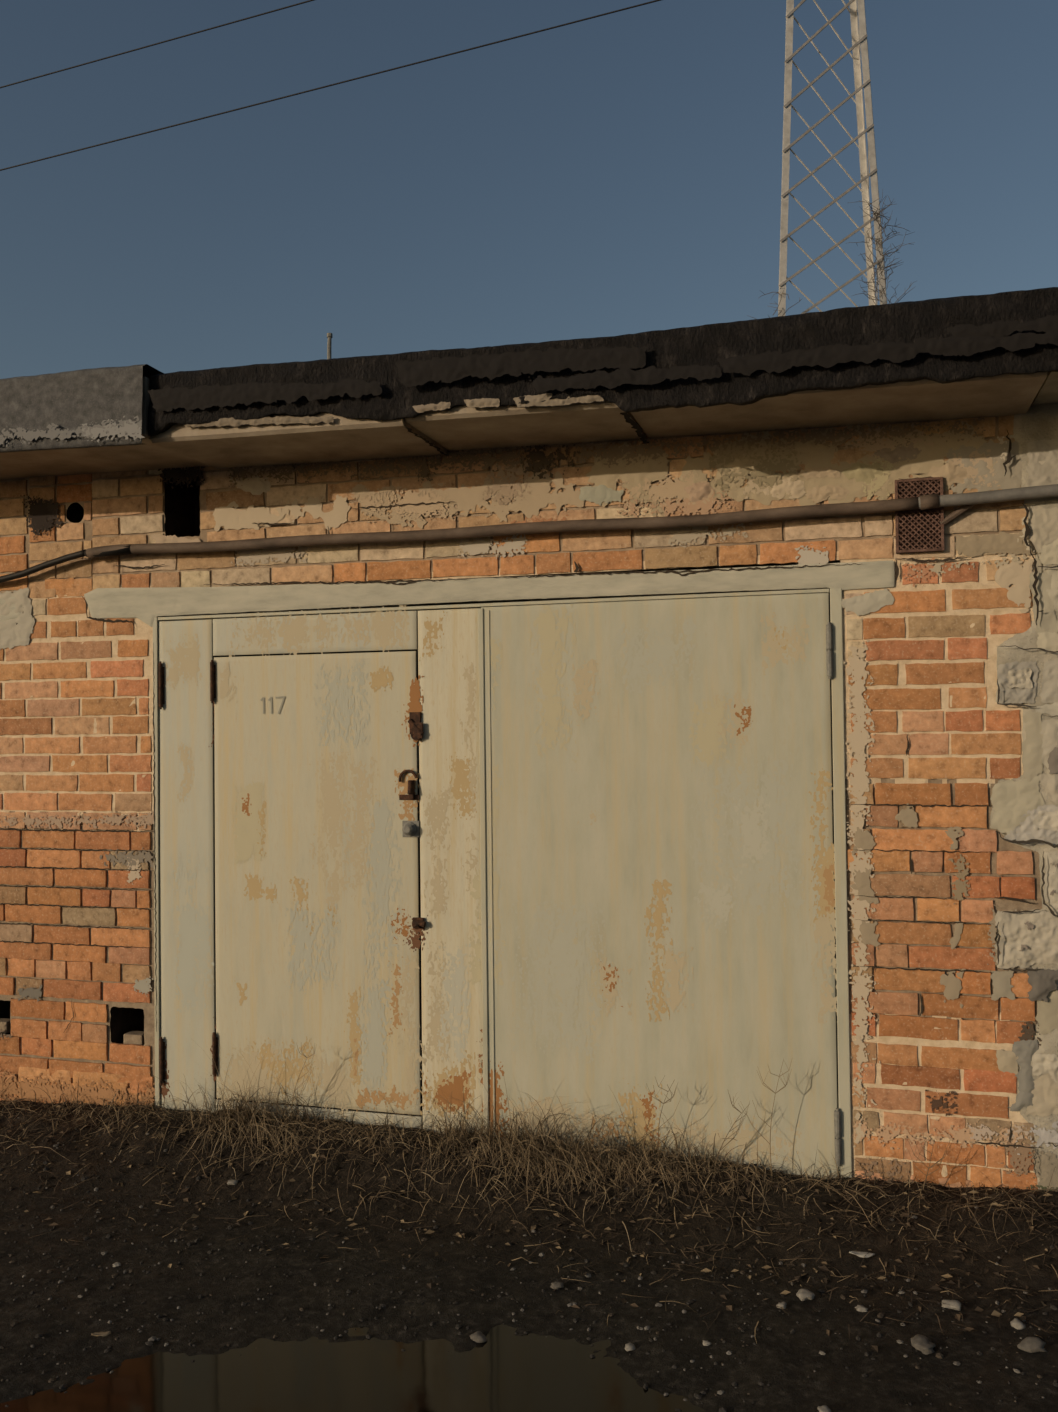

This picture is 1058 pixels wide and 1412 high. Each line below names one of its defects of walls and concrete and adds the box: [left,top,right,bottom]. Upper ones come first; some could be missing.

peeling [395,315,1058,413]
peeling [148,378,382,427]
peeling [1017,517,1058,565]
corrosion [163,633,203,690]
corrosion [401,611,447,747]
spalling [997,661,1039,704]
spalling [1047,747,1058,774]
peeling [1004,804,1058,873]
corrosion [210,651,805,1168]